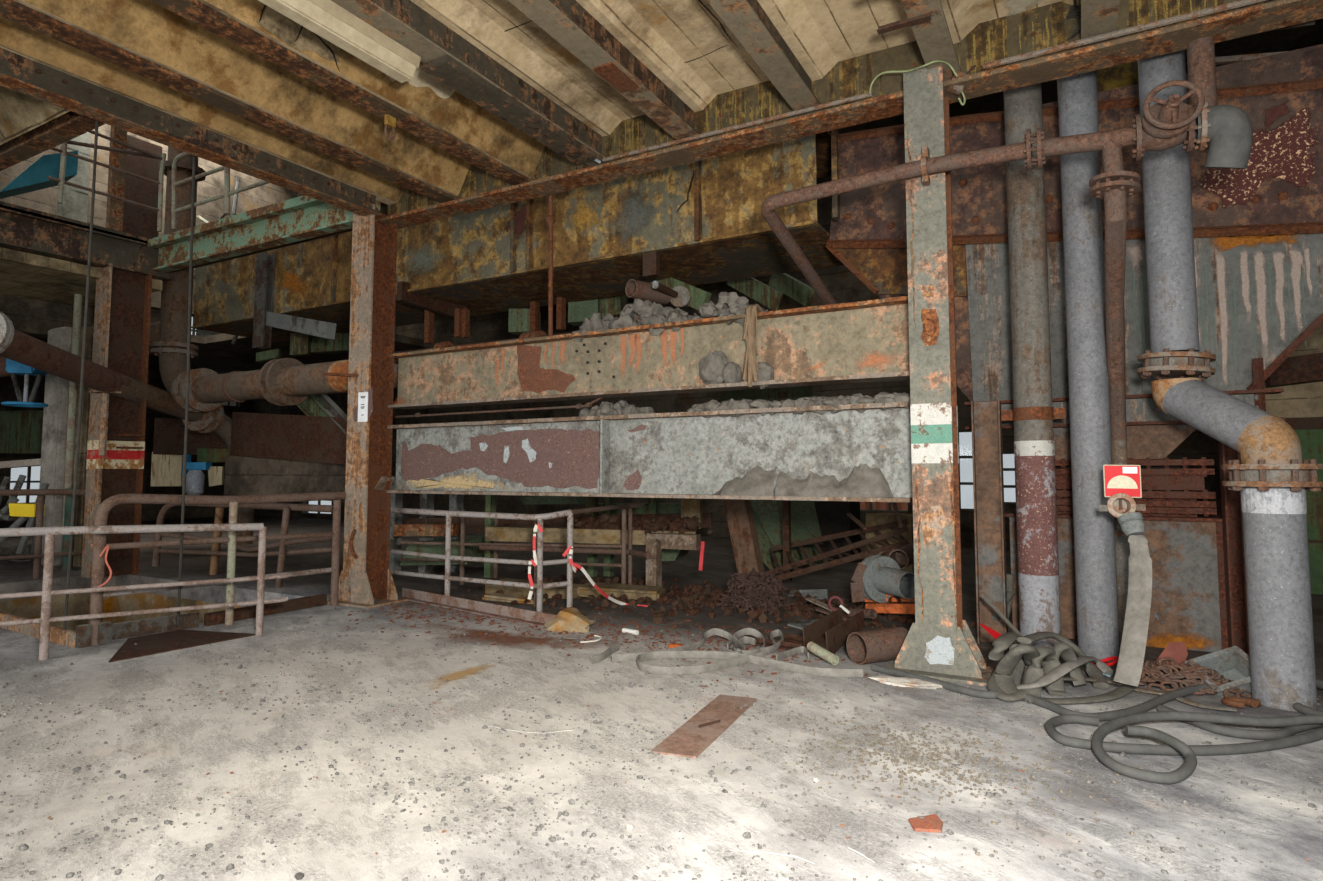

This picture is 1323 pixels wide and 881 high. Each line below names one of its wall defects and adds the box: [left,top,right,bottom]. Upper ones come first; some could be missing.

peeling [1192,101,1318,208]
rust [621,334,641,374]
rust [661,328,684,364]
rust [910,178,939,346]
water stain [1194,248,1312,382]
peeling [401,426,600,489]
peeling [623,470,642,490]
rust [915,466,923,624]